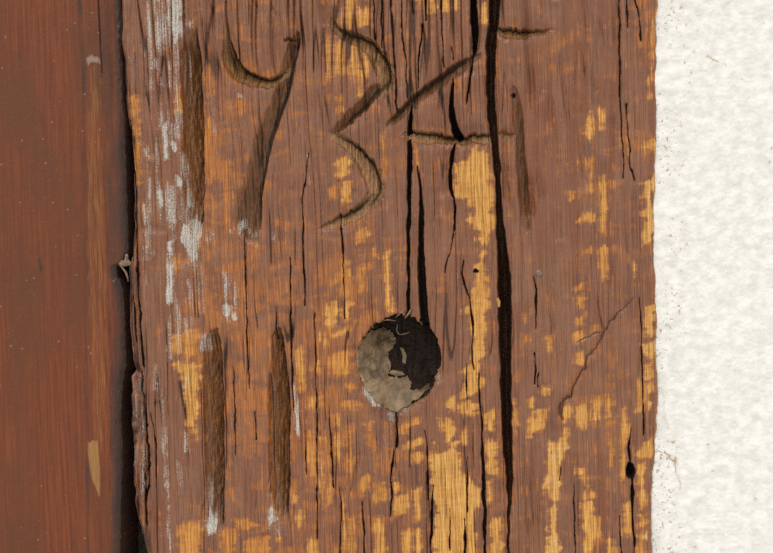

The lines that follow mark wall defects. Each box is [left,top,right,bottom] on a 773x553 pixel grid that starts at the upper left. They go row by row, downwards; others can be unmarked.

peeling [204,117,216,189]
crack [372,0,515,553]
crack [531,276,539,329]
crack [275,152,366,553]
peeling [289,277,391,553]
peeling [398,393,500,469]
crack [532,352,540,388]
crack [557,297,645,553]
peeling [632,296,682,492]
peeling [398,481,427,553]
peeling [486,477,507,553]
peeling [604,496,652,553]